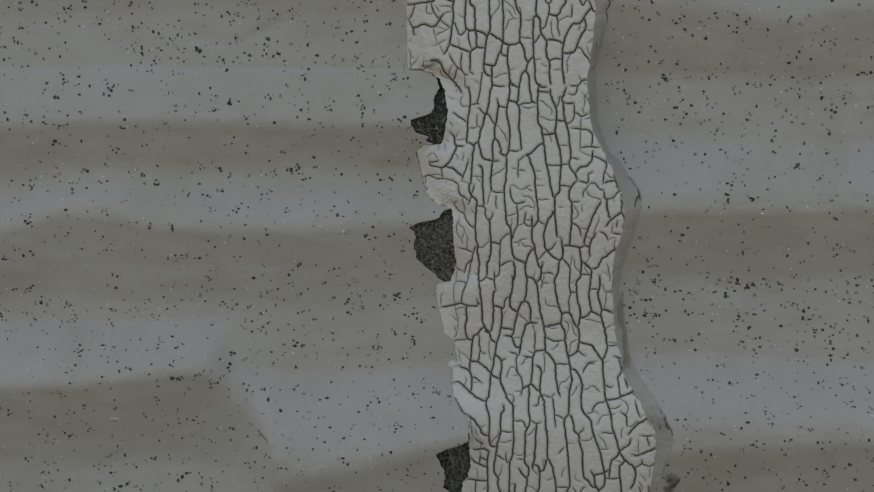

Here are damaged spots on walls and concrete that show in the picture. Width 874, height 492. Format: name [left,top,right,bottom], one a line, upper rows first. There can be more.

crack [408,0,655,492]